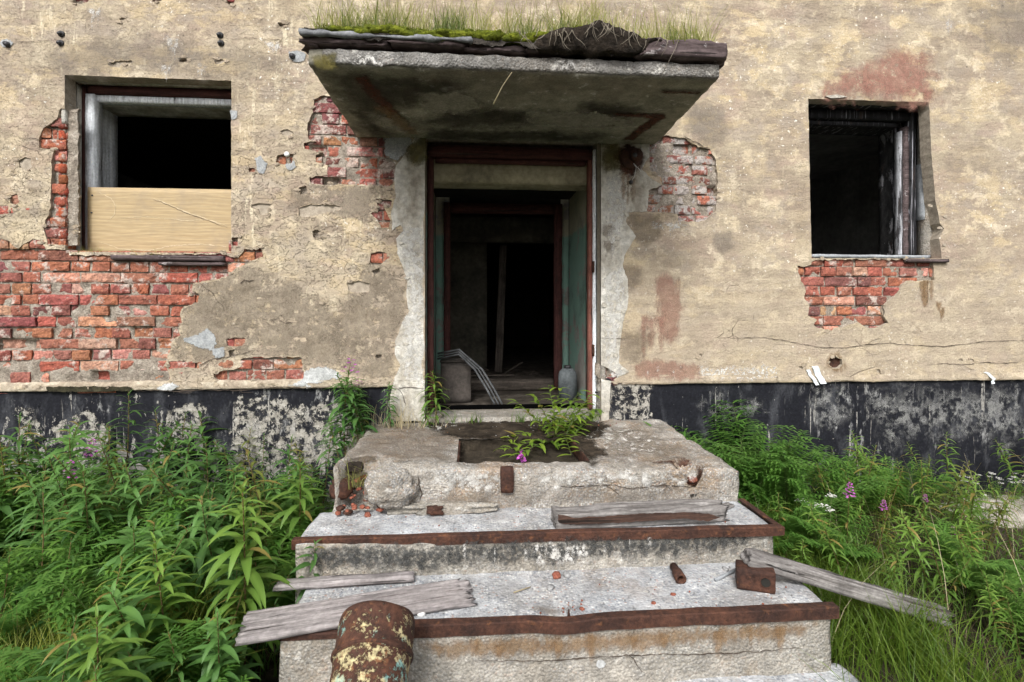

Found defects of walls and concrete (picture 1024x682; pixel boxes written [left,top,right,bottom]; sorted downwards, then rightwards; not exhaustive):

flaking render [647,136,721,222]
flaking render [0,96,424,477]
flaking render [796,256,936,333]
crack [716,306,1024,369]
damp [814,390,845,424]
damp [871,393,1017,436]